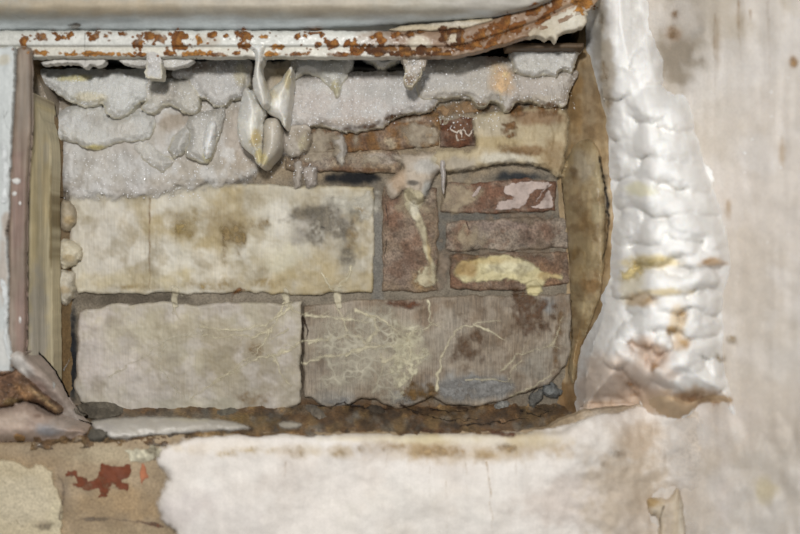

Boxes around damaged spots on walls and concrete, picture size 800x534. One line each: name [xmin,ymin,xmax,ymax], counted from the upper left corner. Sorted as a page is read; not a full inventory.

rust [12,31,76,56]
rust [59,0,598,57]
efflorescence [295,123,341,162]
water stain [386,115,437,149]
water stain [502,103,558,138]
peeling [496,181,553,210]
crack [599,157,610,242]
spalling [305,205,354,242]
crack [301,315,309,384]
spalling [74,402,123,442]
crack [307,387,549,426]
peeling [65,445,162,497]